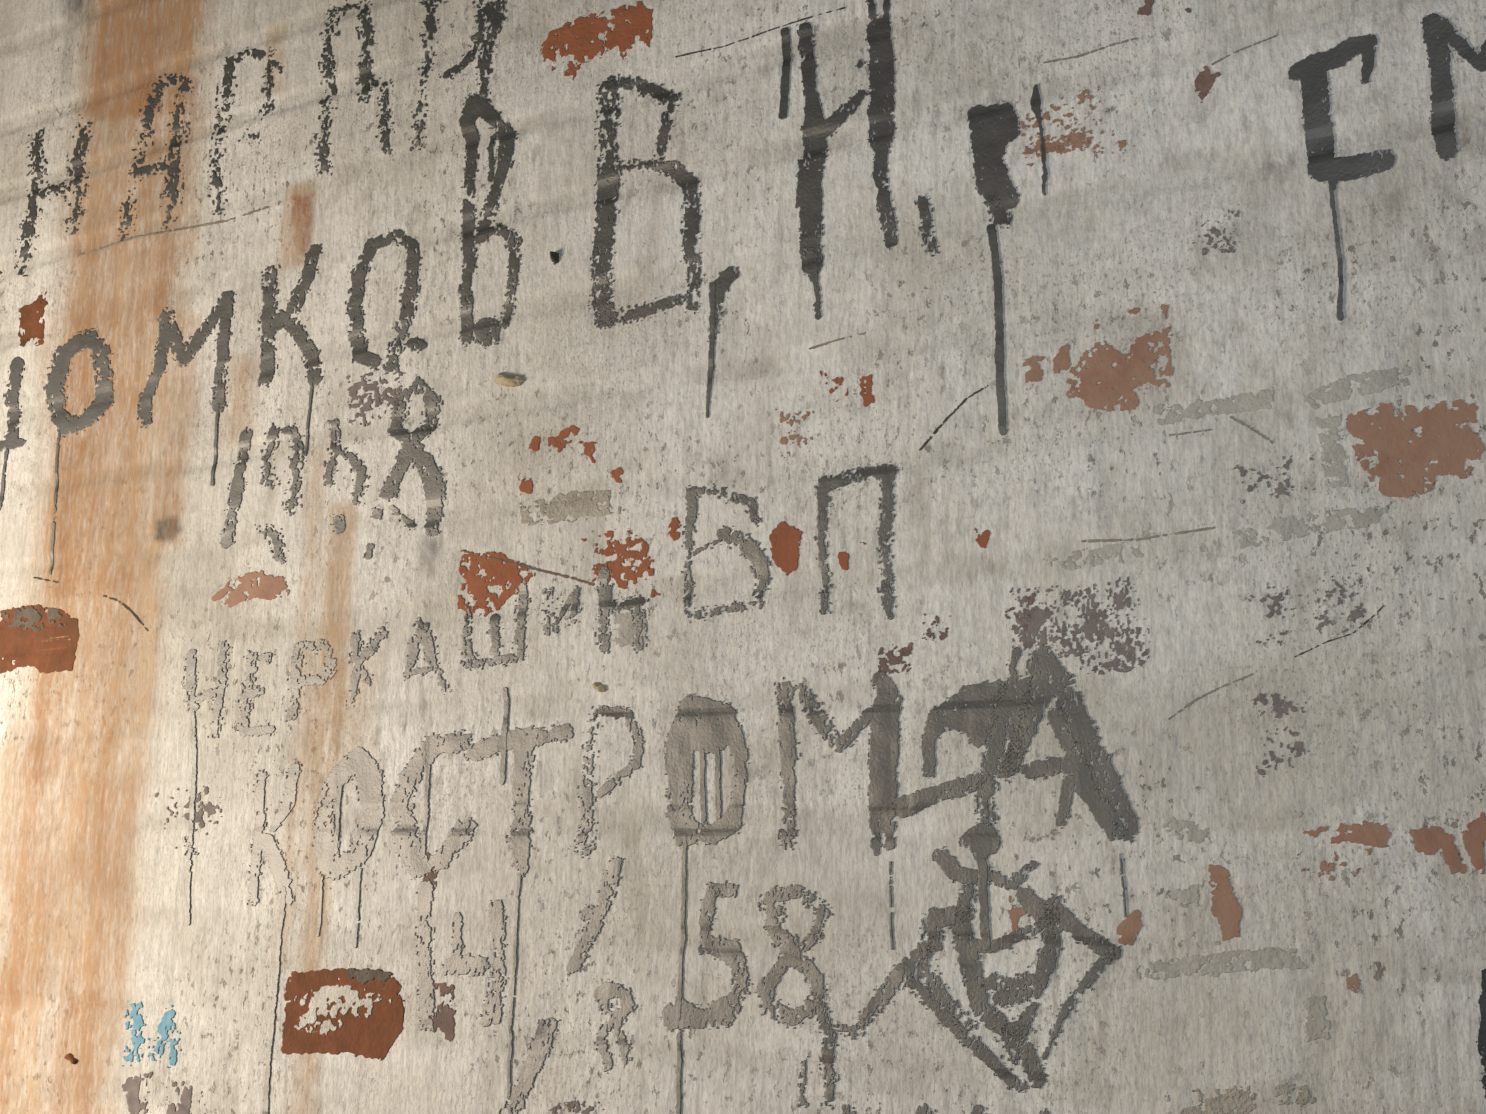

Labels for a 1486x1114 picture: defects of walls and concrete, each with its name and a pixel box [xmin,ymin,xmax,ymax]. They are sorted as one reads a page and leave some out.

peeling [540,1,653,80]
peeling [1022,304,1274,426]
peeling [528,425,596,463]
peeling [1232,366,1485,549]
peeling [0,604,80,674]
corrosion [0,0,200,1114]
peeling [457,551,535,617]
peeling [518,467,660,598]
peeling [1245,565,1378,647]
peeling [1251,693,1309,777]
peeling [281,968,405,1061]
peeling [429,982,456,1042]